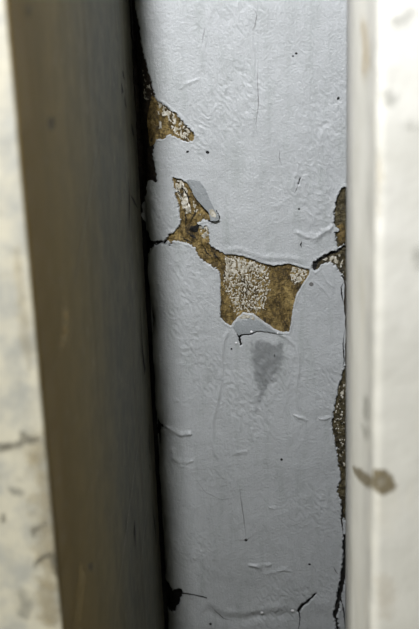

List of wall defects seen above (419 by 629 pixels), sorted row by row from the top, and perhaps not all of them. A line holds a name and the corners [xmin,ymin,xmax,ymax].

spalling [132,0,194,212]
peeling [167,177,314,345]
spalling [333,187,346,247]
crack [128,178,207,629]
spalling [332,366,346,520]
crack [297,593,316,629]
crack [333,502,345,629]